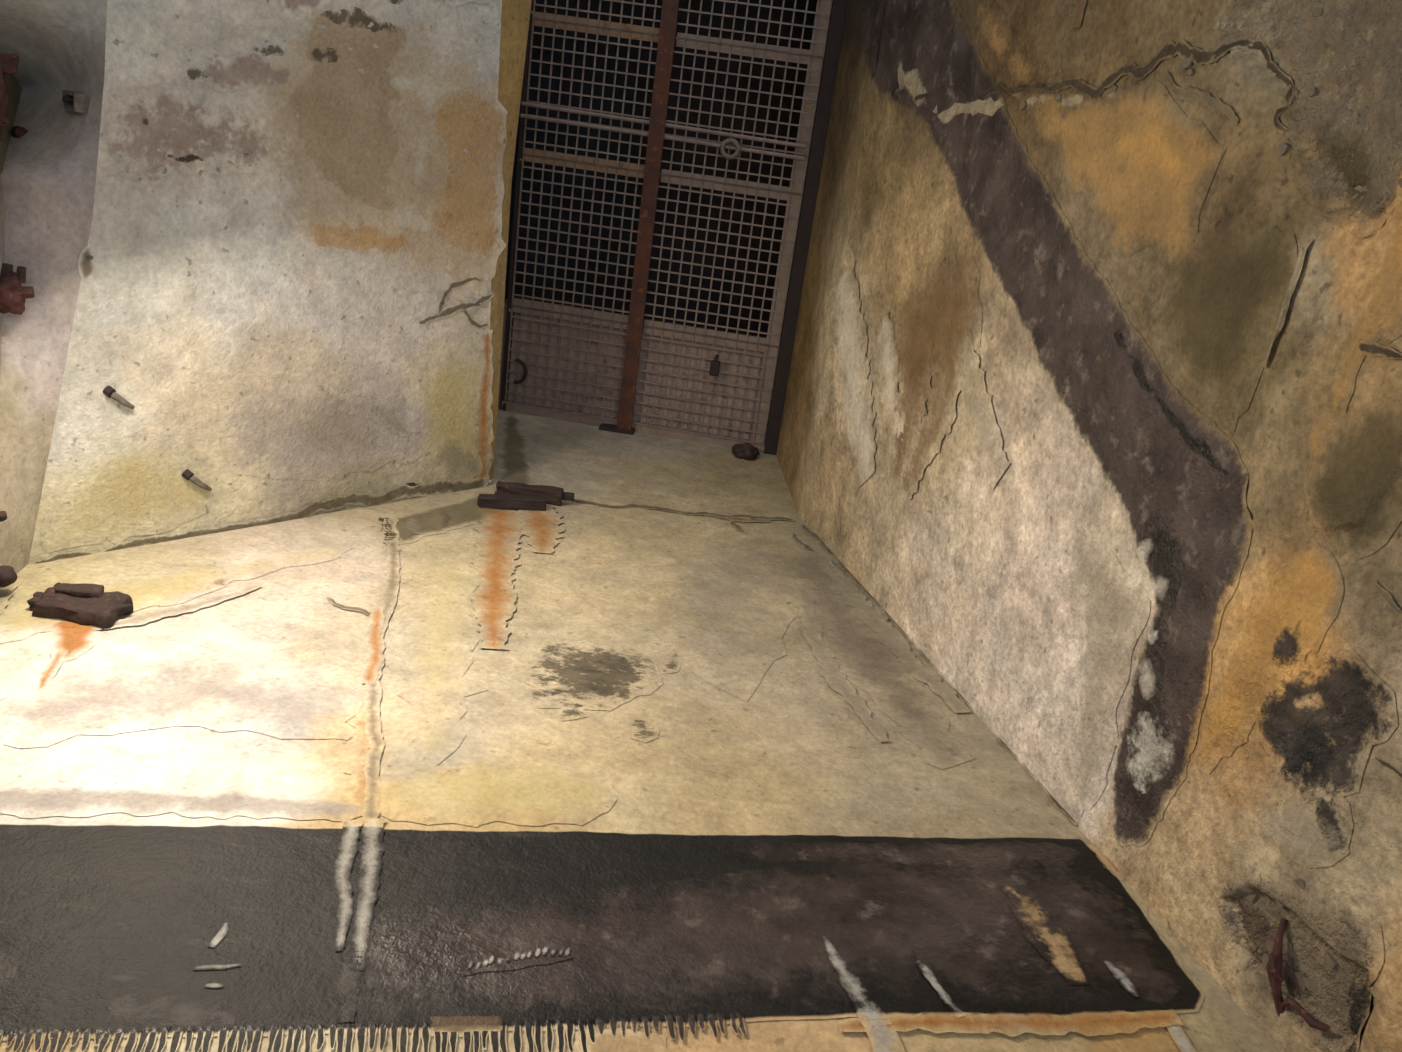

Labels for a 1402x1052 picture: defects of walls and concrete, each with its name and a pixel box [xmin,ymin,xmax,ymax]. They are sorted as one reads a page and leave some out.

leakage [243,0,499,302]
crack [897,38,1298,134]
crack [416,276,494,328]
corrosion [35,620,101,692]
leakage [90,544,354,631]
crack [31,477,489,824]
leakage [0,560,618,1023]
corrosion [469,330,565,650]
leakage [524,532,975,769]
leakage [1068,530,1176,817]
leakage [1193,195,1402,868]
spalling [1212,866,1384,1052]